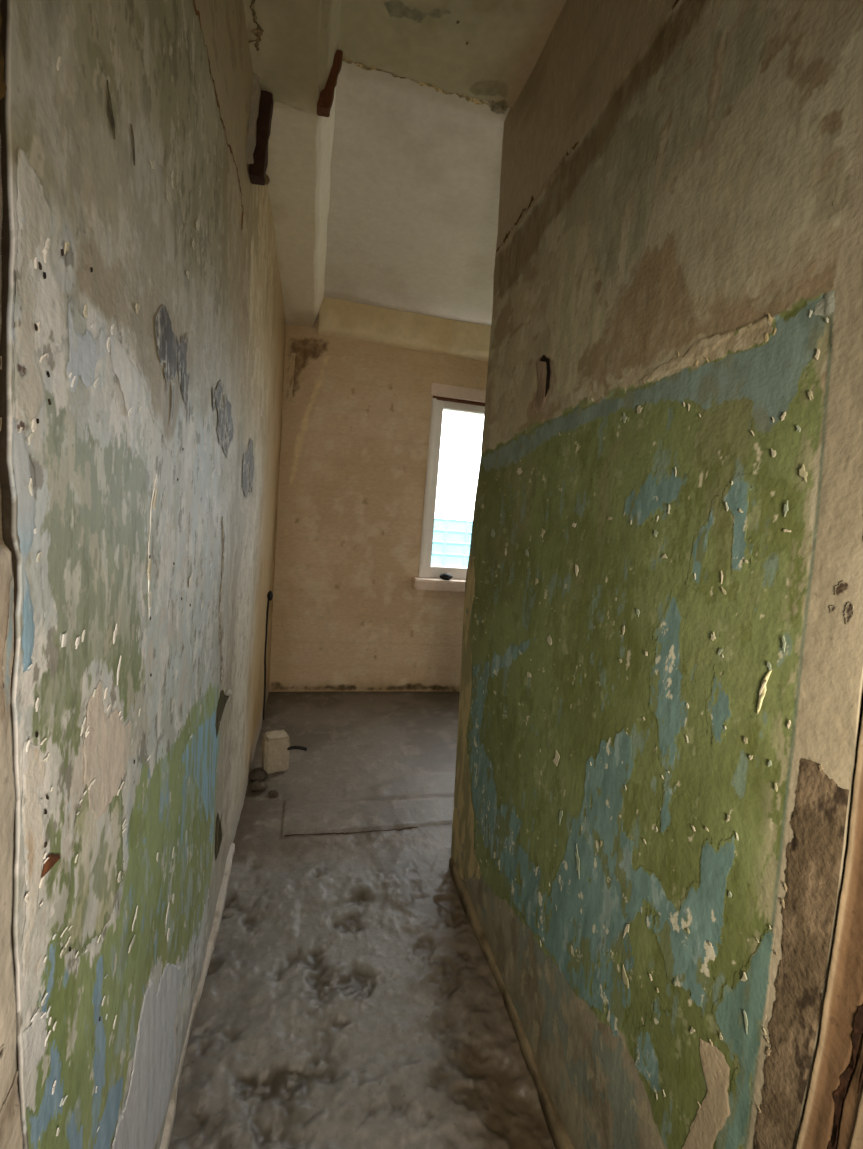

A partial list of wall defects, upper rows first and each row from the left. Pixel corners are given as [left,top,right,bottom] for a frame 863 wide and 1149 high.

crack [194,0,244,229]
crack [249,0,264,51]
peeling [383,0,460,25]
peeling [468,79,509,116]
peeling [480,235,836,475]
peeling [13,147,232,1149]
peeling [451,465,849,1149]
crack [827,1005,863,1149]